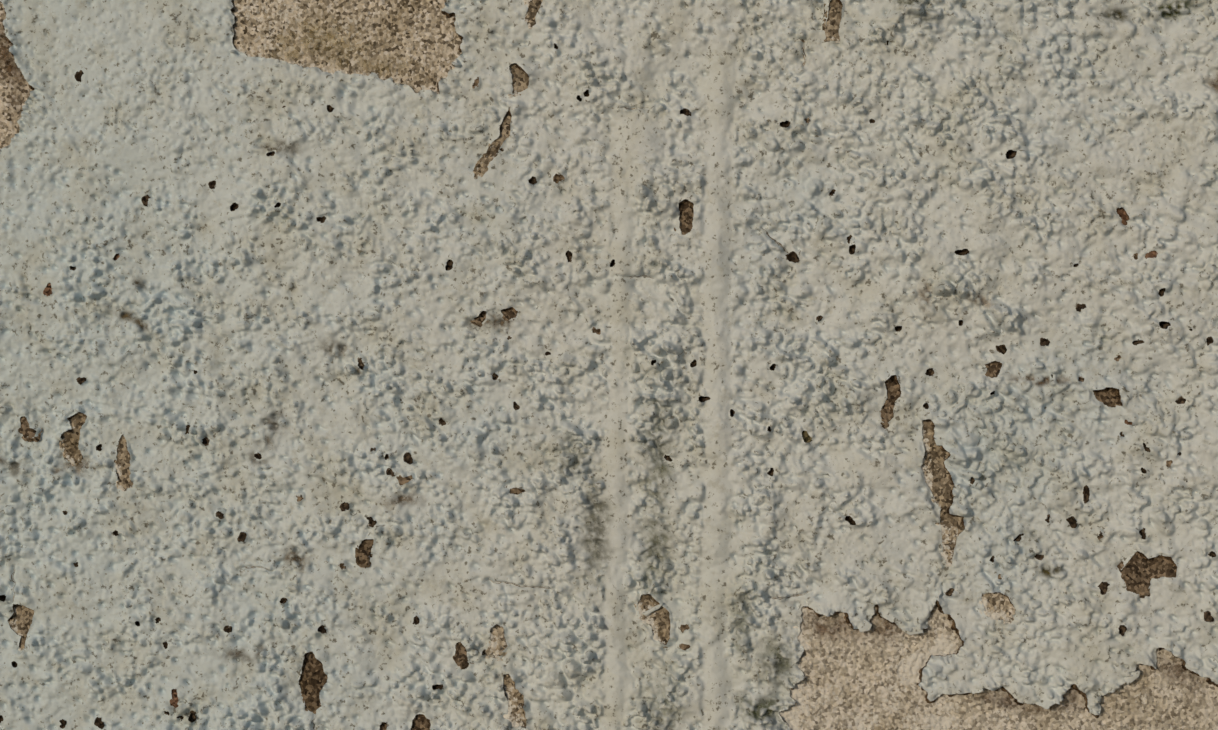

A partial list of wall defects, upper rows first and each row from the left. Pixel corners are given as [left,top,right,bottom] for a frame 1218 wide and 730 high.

peeling [0,1,35,149]
peeling [231,0,463,94]
peeling [523,0,543,29]
peeling [473,63,529,179]
peeling [985,361,1002,395]
peeling [59,412,87,467]
peeling [921,403,965,567]
peeling [1117,529,1177,598]
peeling [634,594,687,648]
peeling [299,652,328,714]
peeling [779,592,1218,730]
peeling [410,714,431,730]